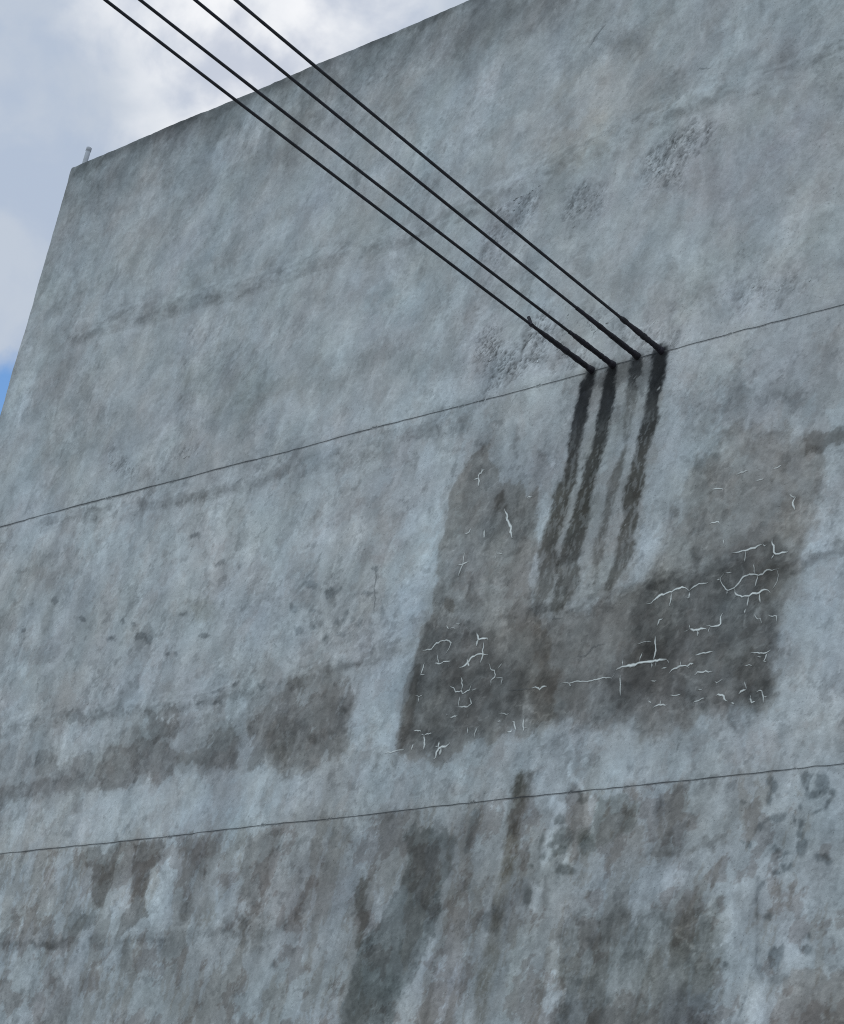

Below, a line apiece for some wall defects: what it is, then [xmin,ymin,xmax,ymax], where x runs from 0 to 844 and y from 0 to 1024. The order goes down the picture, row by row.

crack [385,623,527,760]
leakage [386,339,844,774]
crack [533,521,788,708]